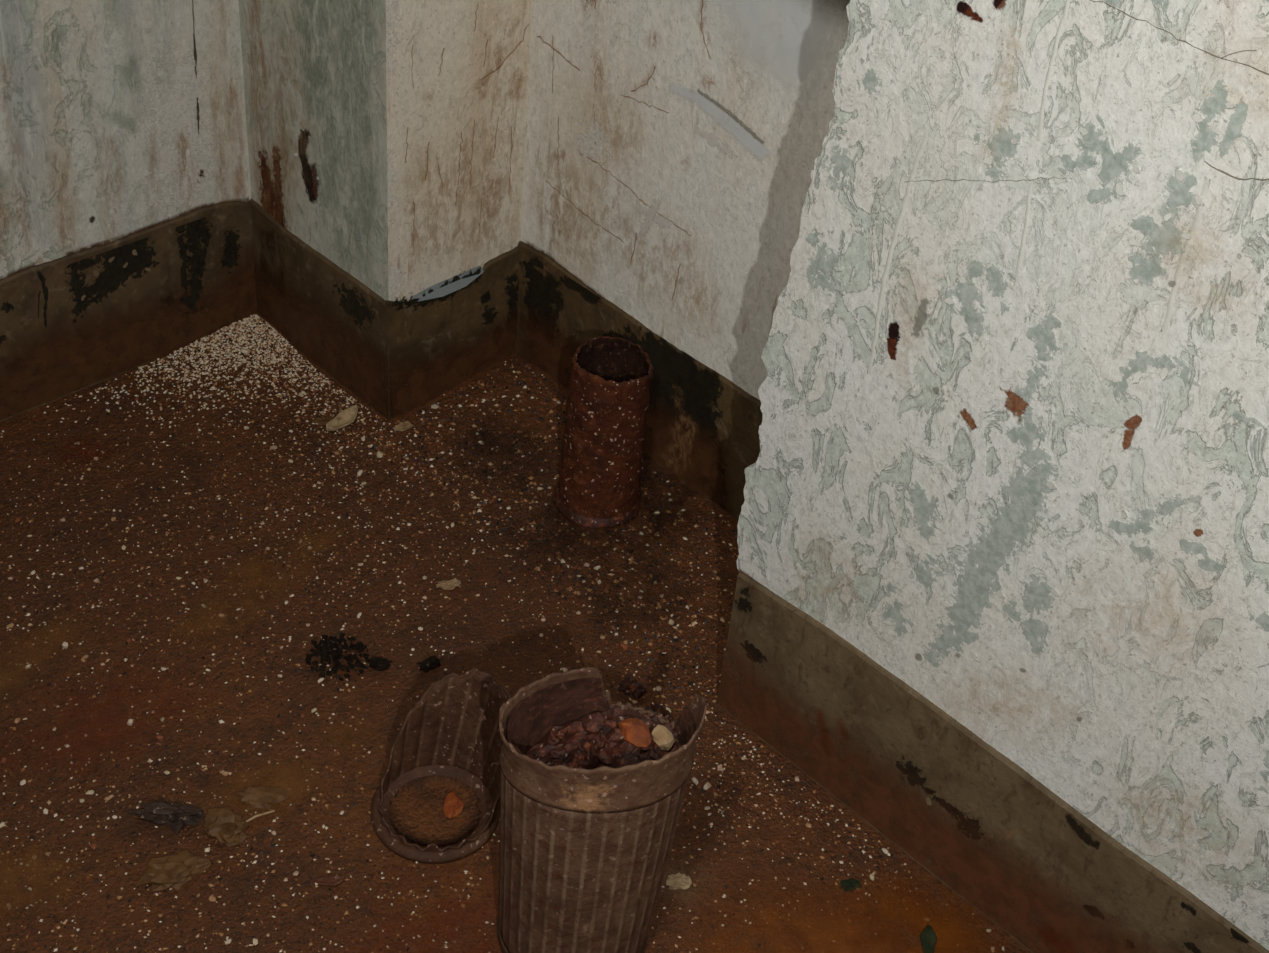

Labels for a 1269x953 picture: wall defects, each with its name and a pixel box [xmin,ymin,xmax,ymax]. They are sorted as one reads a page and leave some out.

corrosion [957,1,983,22]
corrosion [257,146,287,229]
corrosion [960,409,977,430]
corrosion [1000,388,1029,422]
corrosion [1122,415,1142,449]